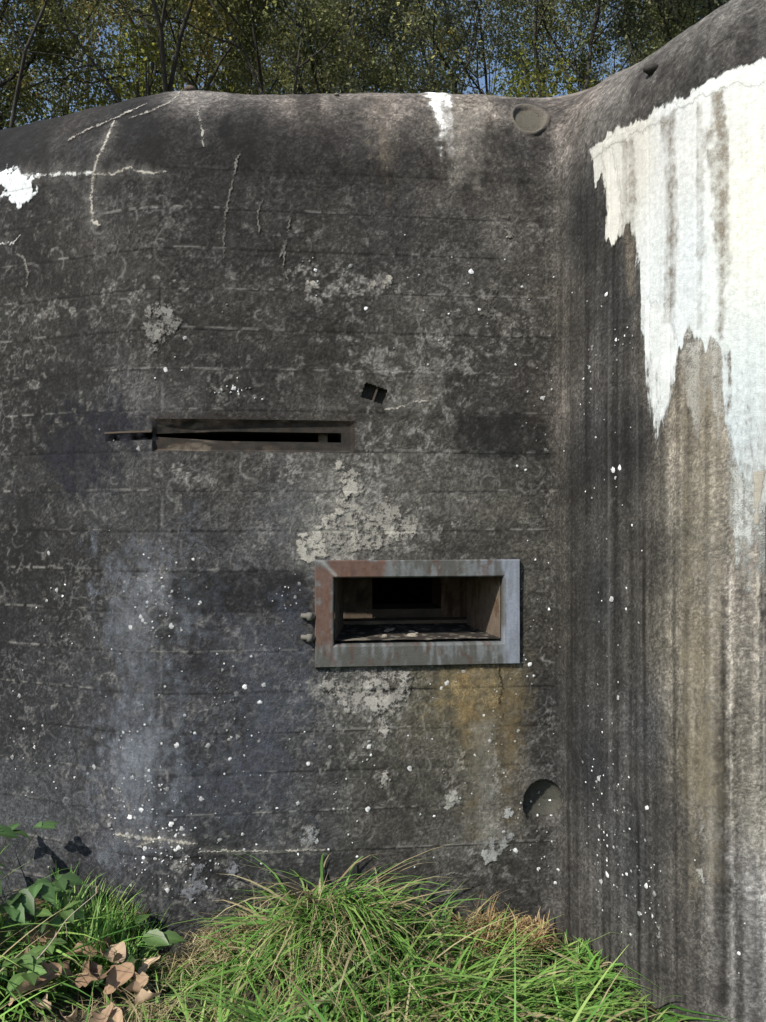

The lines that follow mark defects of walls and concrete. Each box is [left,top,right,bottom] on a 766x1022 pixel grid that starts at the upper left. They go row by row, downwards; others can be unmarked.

crack [21,91,204,226]
crack [222,155,240,258]
crack [279,218,291,279]
water stain [425,92,483,189]
water stain [590,57,766,628]